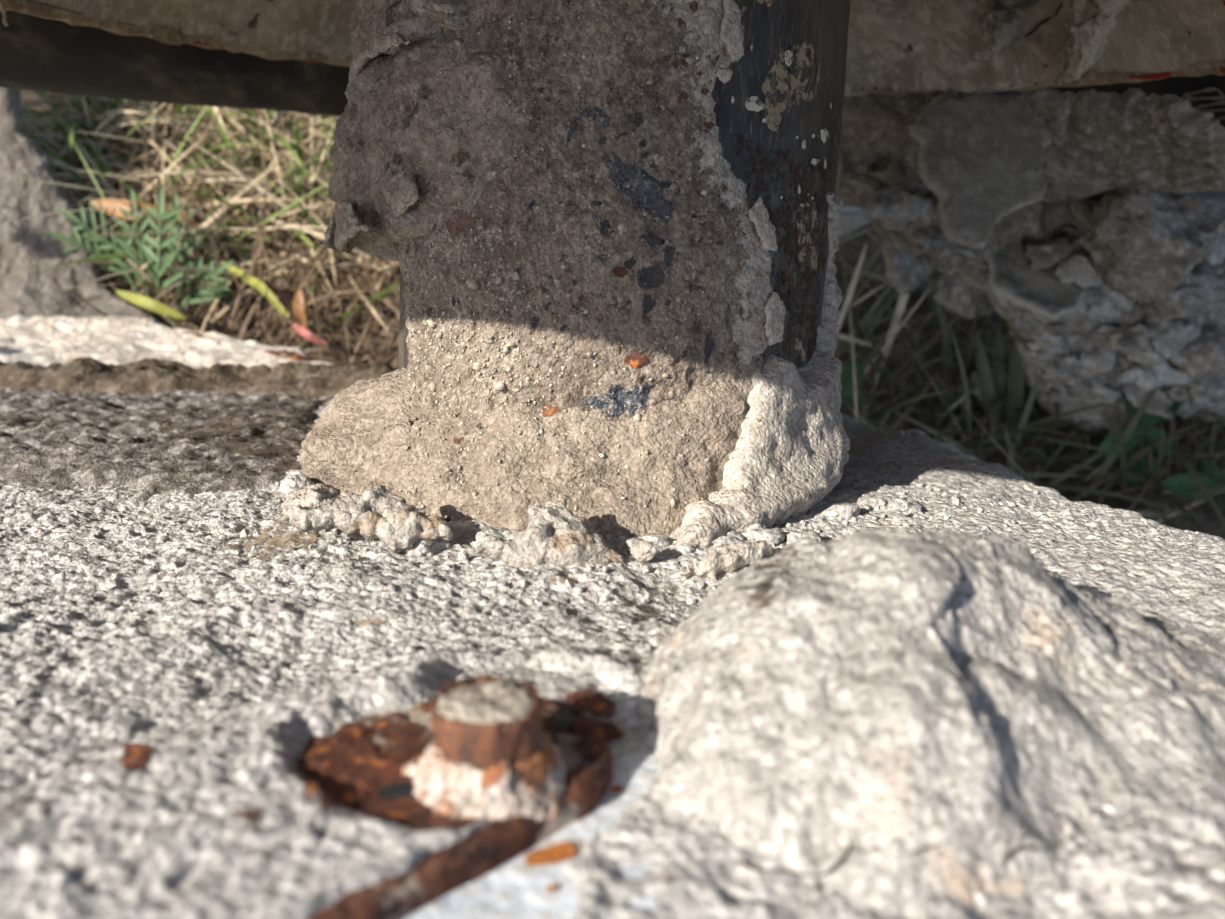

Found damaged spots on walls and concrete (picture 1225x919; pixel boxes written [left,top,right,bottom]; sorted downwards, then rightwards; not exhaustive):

rust [733,134,834,368]
rust [563,682,624,749]
rust [294,712,442,818]
rust [234,806,264,822]
rust [524,841,576,866]